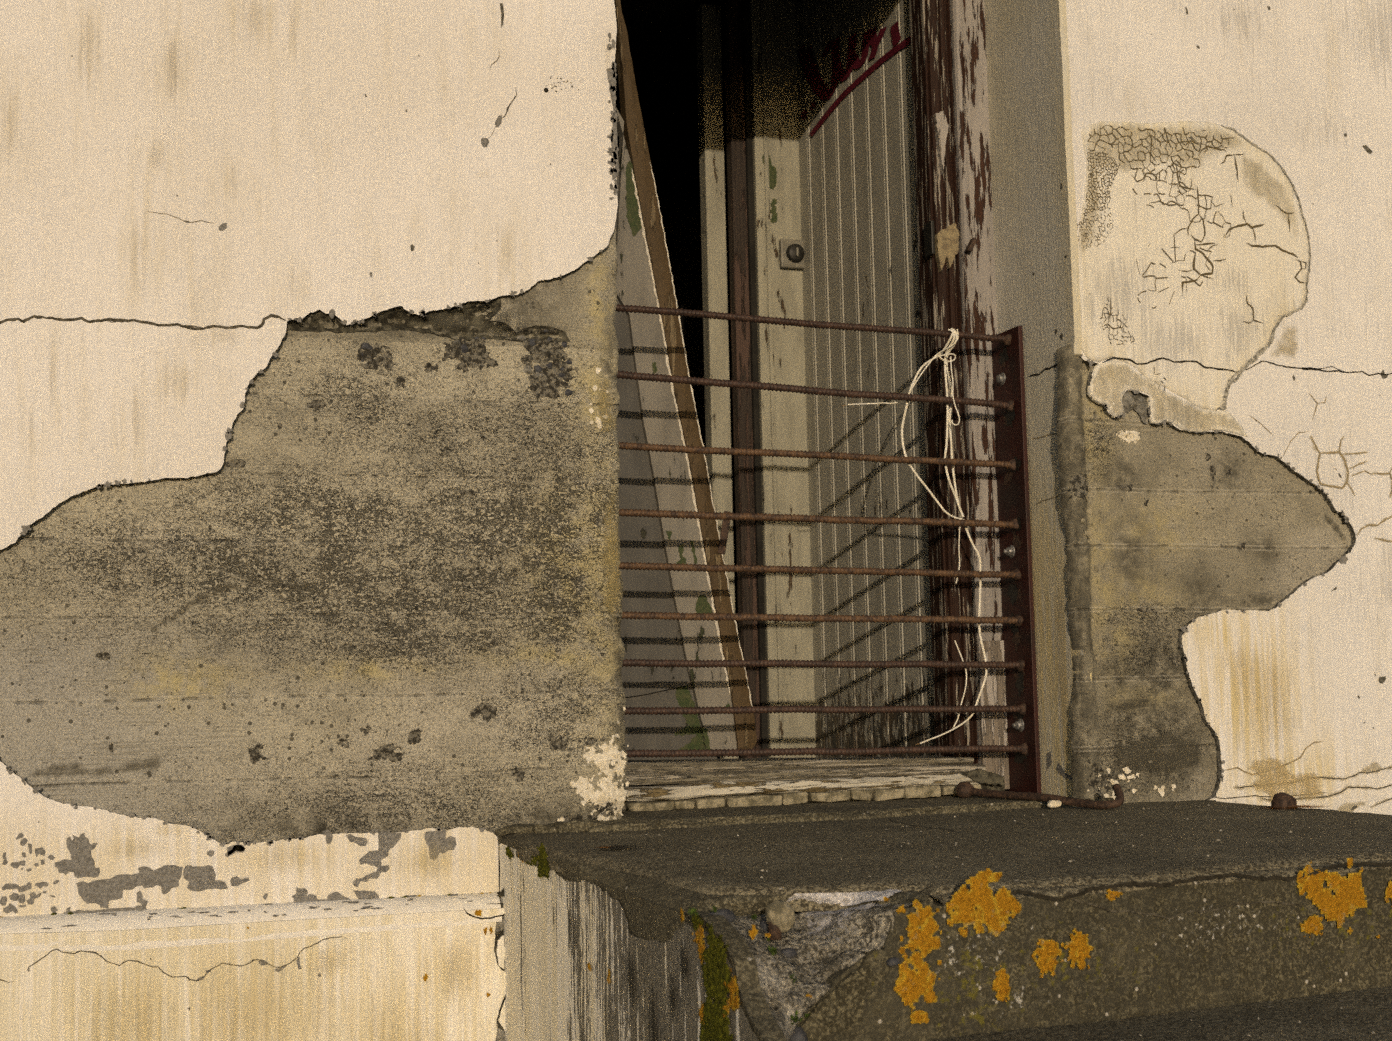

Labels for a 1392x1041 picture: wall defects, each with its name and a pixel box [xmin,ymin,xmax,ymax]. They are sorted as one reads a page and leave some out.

crack [0,314,285,330]
crack [1027,364,1057,378]
spalling [0,32,642,929]
crack [1104,357,1392,542]
spalling [1047,329,1353,803]
crack [1216,741,1392,812]
crack [1010,862,1392,901]
crack [0,936,345,983]
spalling [692,889,929,1041]